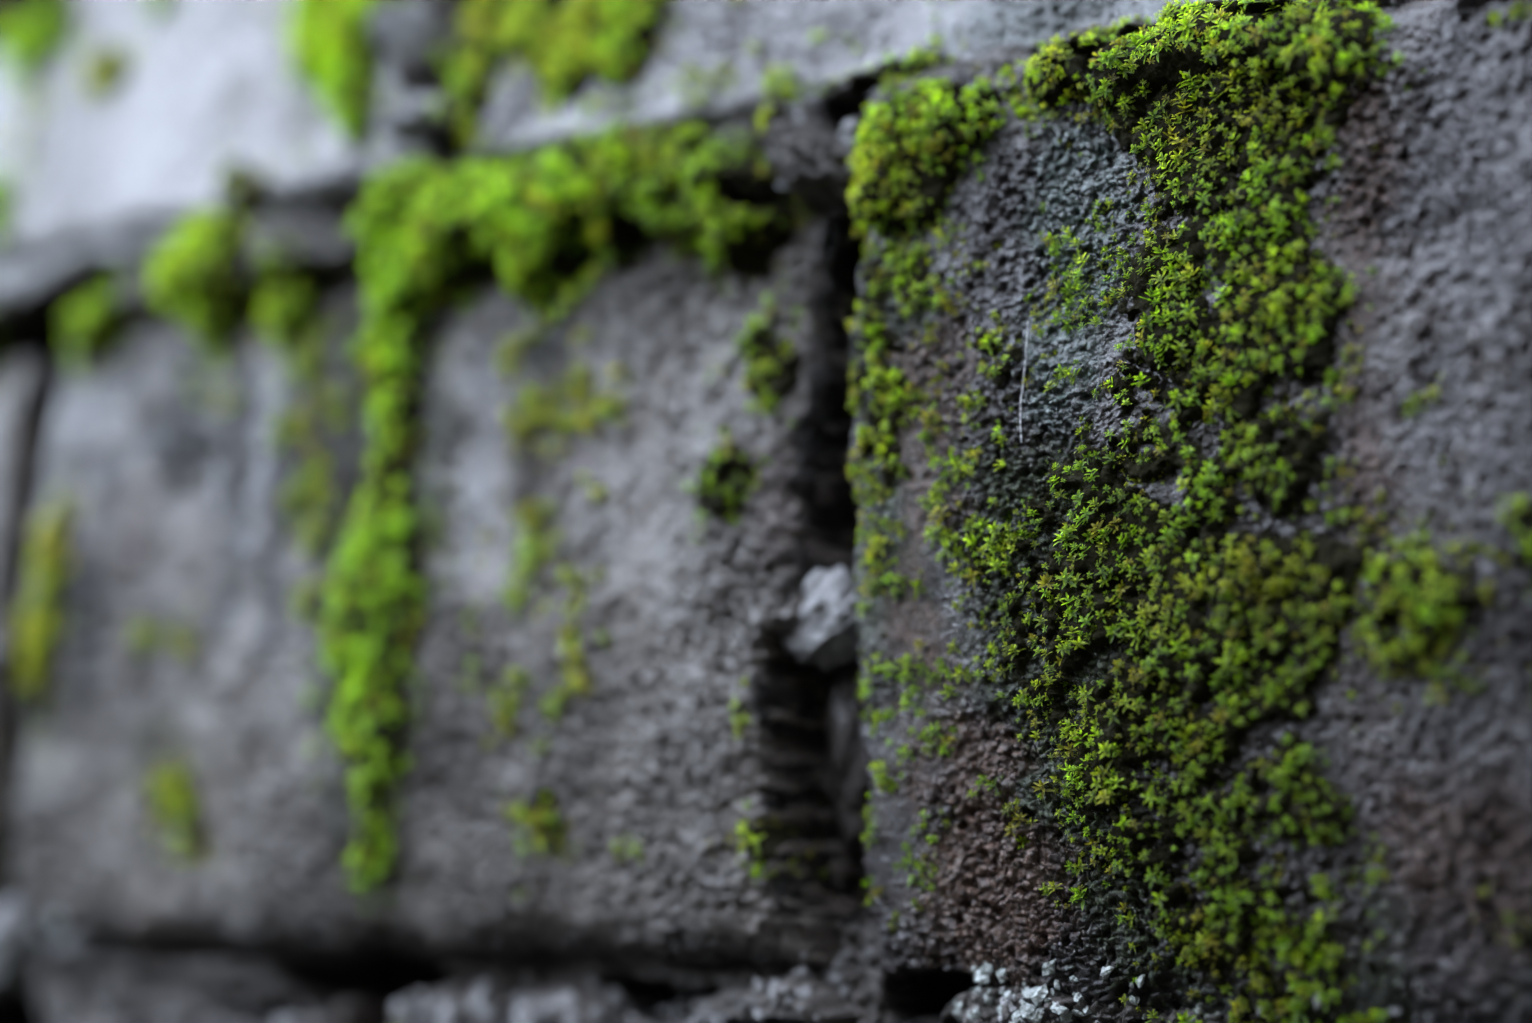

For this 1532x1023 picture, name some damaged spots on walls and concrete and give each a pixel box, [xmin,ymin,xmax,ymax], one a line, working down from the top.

water stain [1093,981,1278,1023]